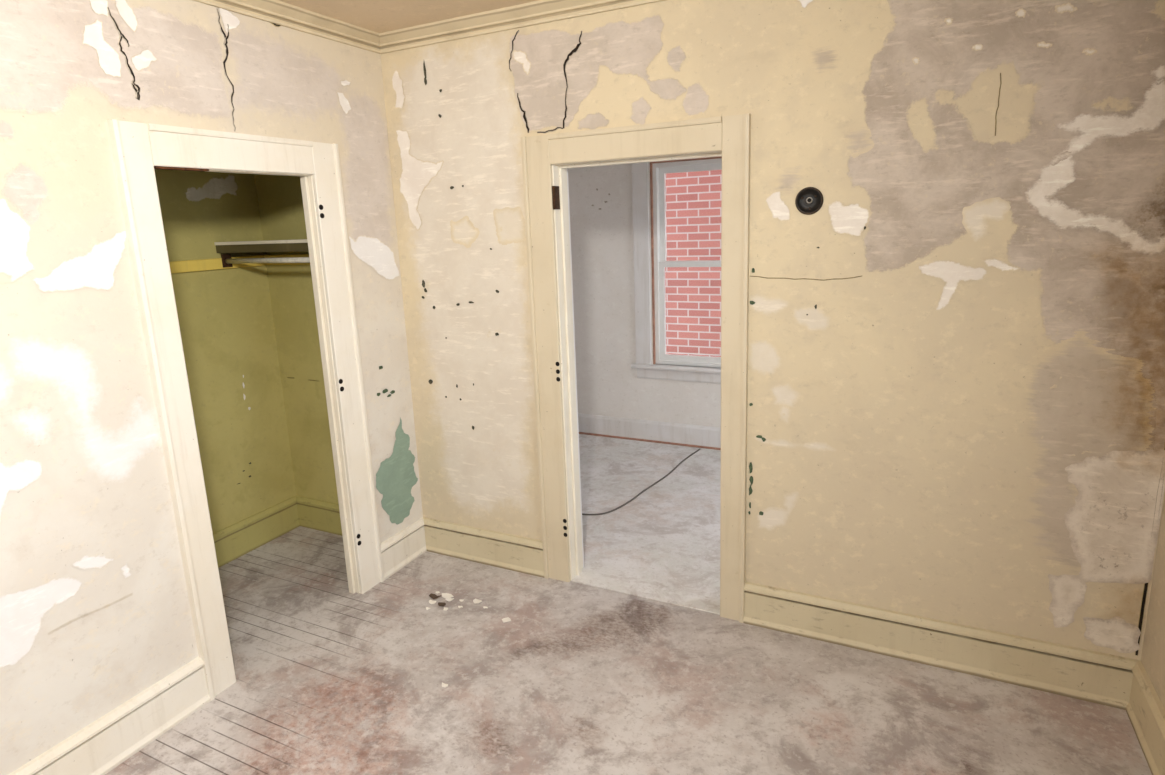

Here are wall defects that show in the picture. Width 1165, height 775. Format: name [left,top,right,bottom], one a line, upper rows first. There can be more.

crack [107,7,140,100]
crack [216,8,236,131]
crack [509,30,583,133]
peeling [765,164,804,222]
peeling [0,0,710,526]
peeling [827,0,1165,653]
peeling [0,554,132,669]